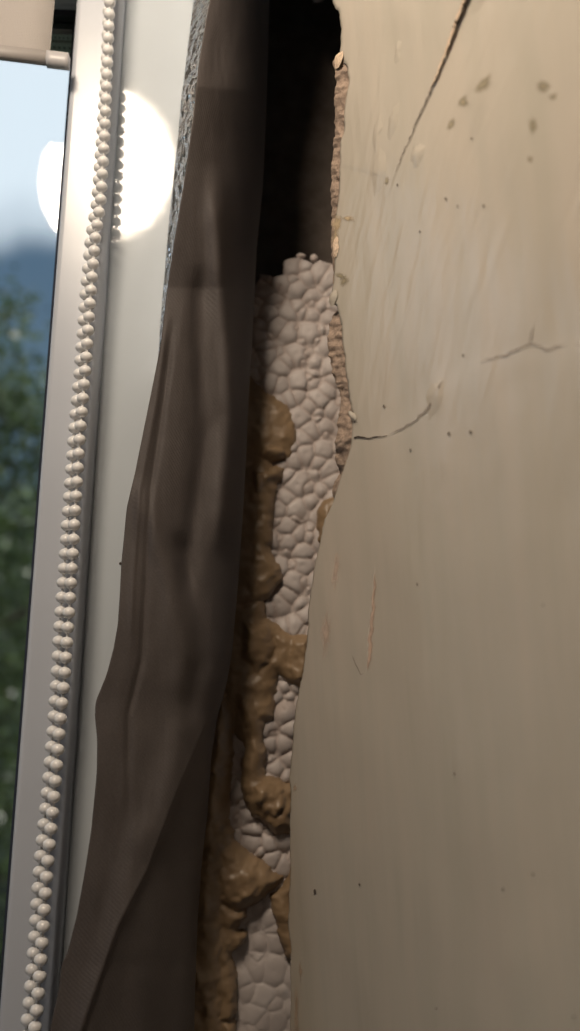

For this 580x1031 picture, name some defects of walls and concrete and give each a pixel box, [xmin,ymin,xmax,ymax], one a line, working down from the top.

crack [397,0,469,166]
spalling [327,51,356,498]
crack [354,383,441,439]
crack [486,329,560,360]